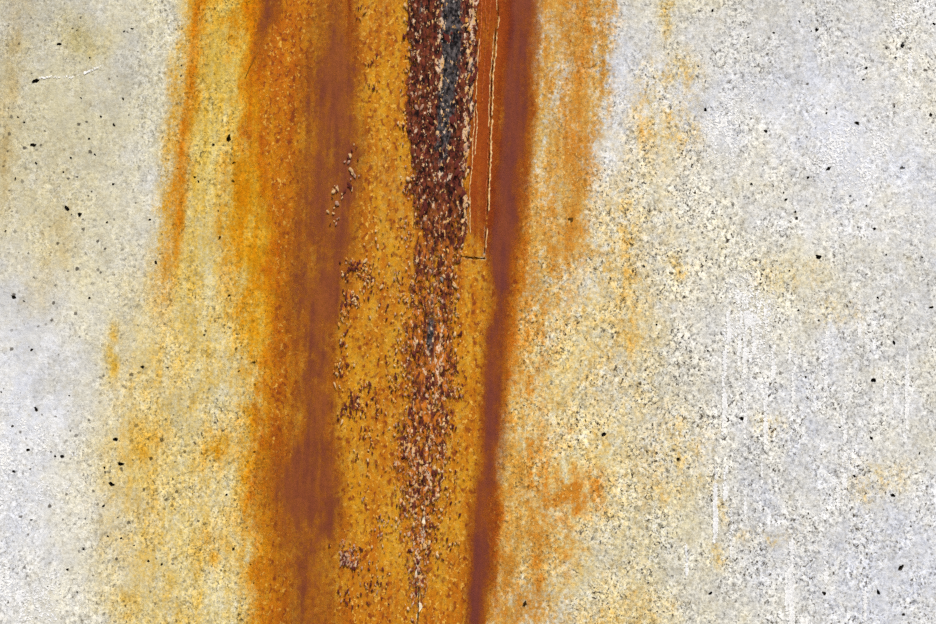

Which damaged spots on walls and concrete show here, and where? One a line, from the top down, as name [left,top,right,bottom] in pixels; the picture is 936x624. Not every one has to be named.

rust [237,0,614,624]